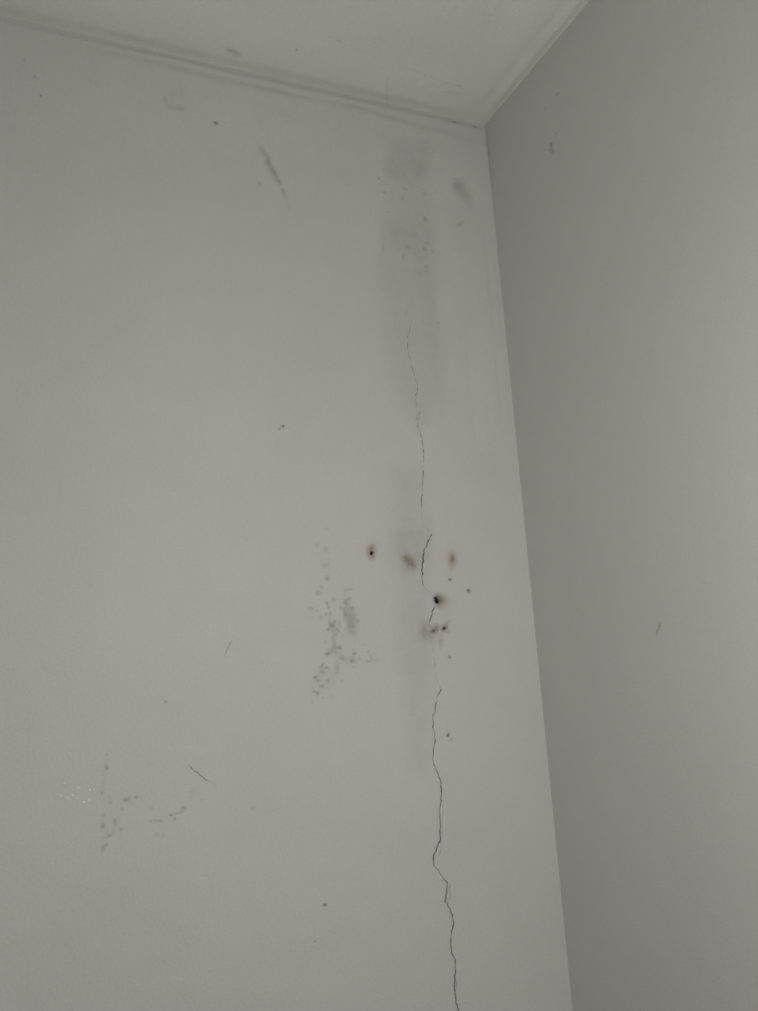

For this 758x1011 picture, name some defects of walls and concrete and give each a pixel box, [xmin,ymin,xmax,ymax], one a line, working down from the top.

crack [432,691,461,1011]